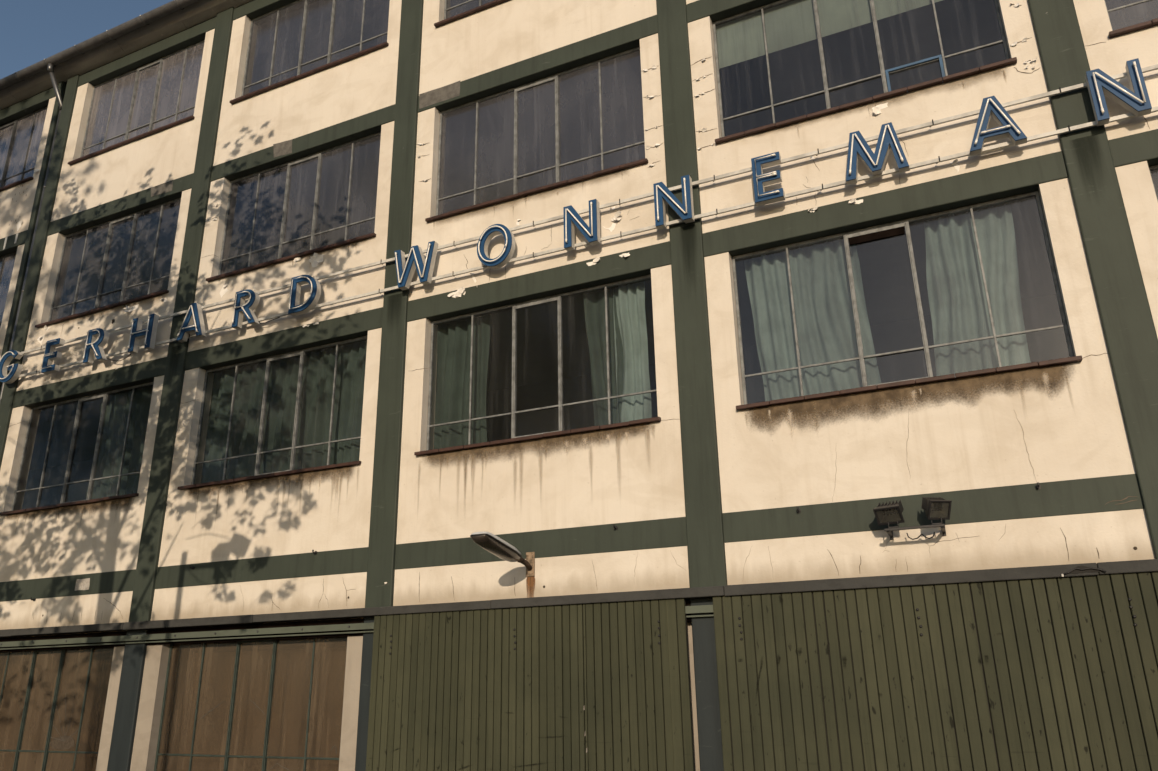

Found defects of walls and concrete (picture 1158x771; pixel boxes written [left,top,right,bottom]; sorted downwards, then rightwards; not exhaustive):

leakage [749,363,1068,428]
leakage [426,423,650,463]